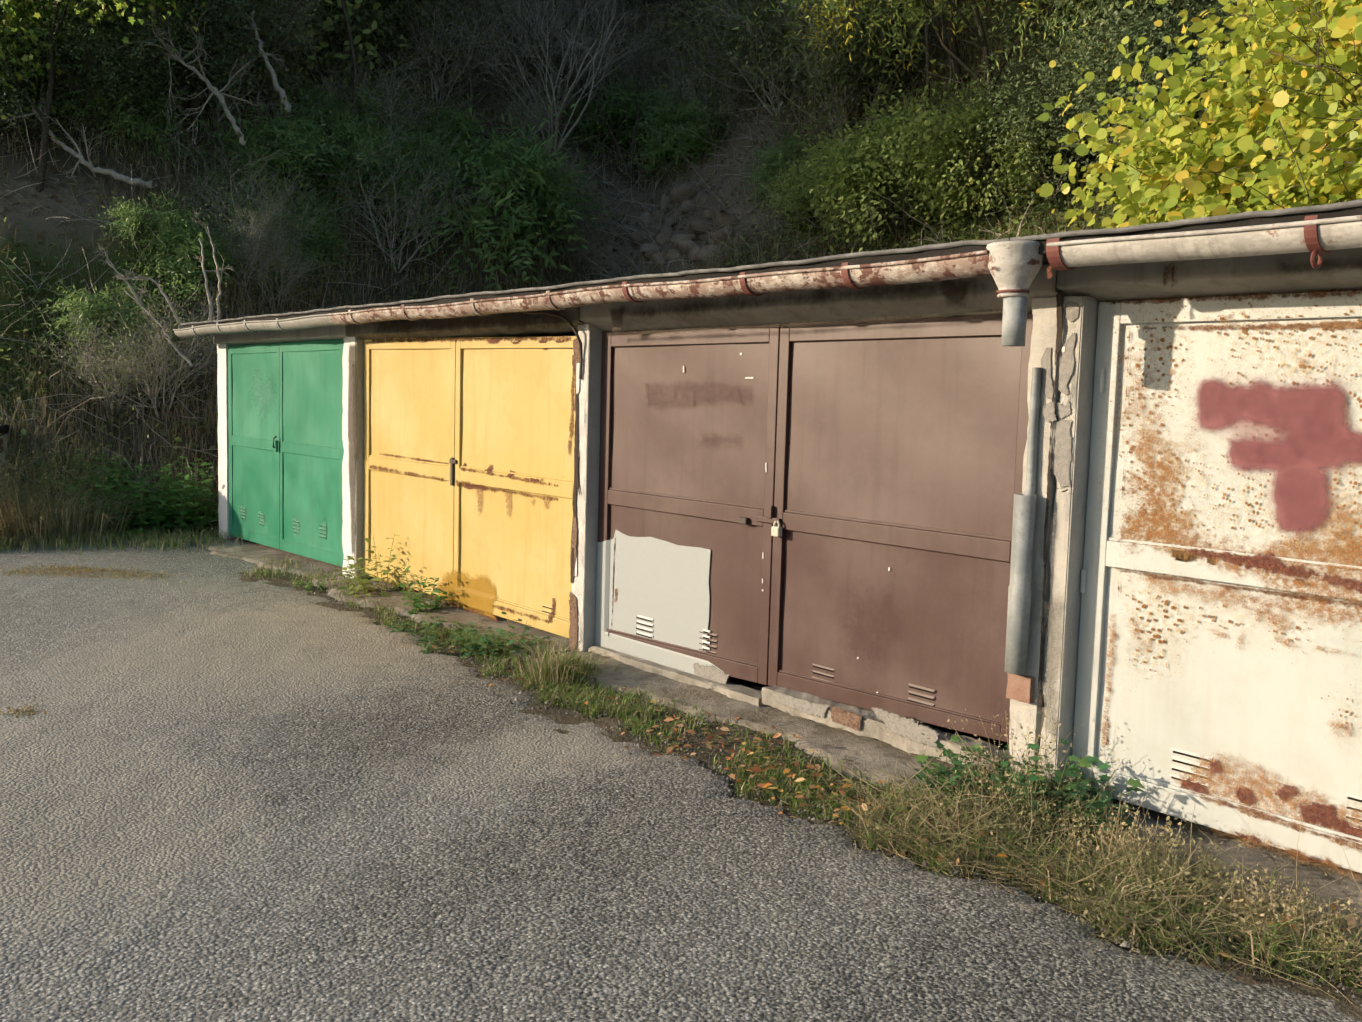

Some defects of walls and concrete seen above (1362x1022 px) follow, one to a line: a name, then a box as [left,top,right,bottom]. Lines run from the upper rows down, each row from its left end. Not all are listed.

corrosion [369,453,558,515]
corrosion [1099,265,1362,701]
corrosion [382,581,555,623]
spalling [775,692,938,749]
corrosion [1180,758,1362,850]
corrosion [1233,832,1355,876]